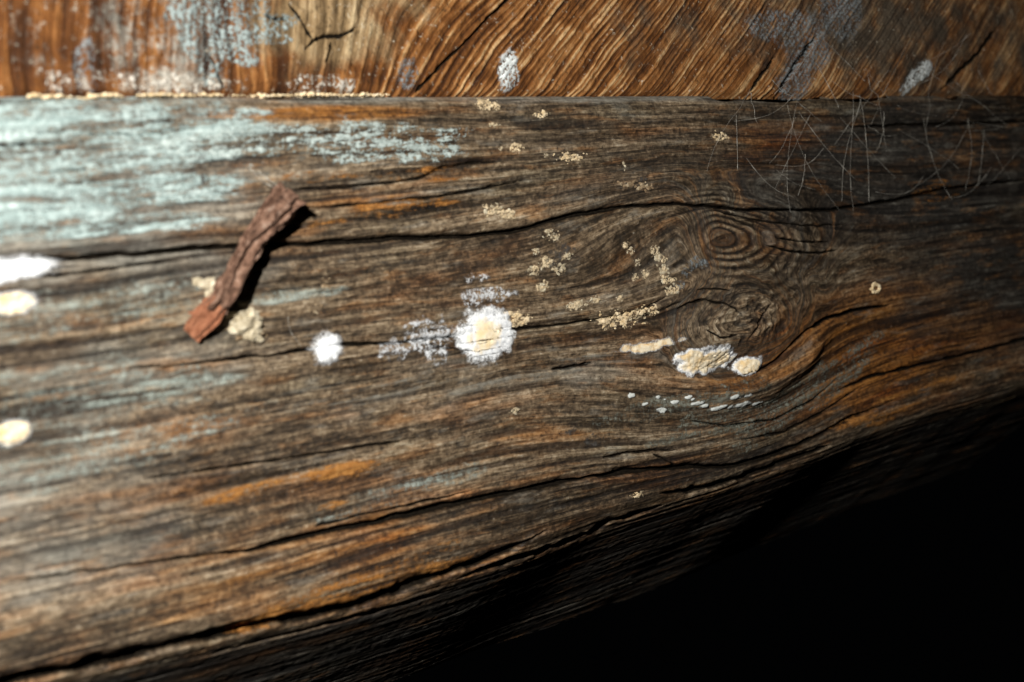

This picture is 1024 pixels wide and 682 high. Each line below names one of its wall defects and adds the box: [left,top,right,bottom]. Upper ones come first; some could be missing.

crack [263,180,1021,254]
leakage [0,255,56,316]
crack [7,244,238,277]
leakage [255,291,311,304]
crack [340,335,459,350]
mould [379,274,516,364]
crack [511,288,769,338]
leakage [621,333,884,452]
crack [0,338,1024,682]